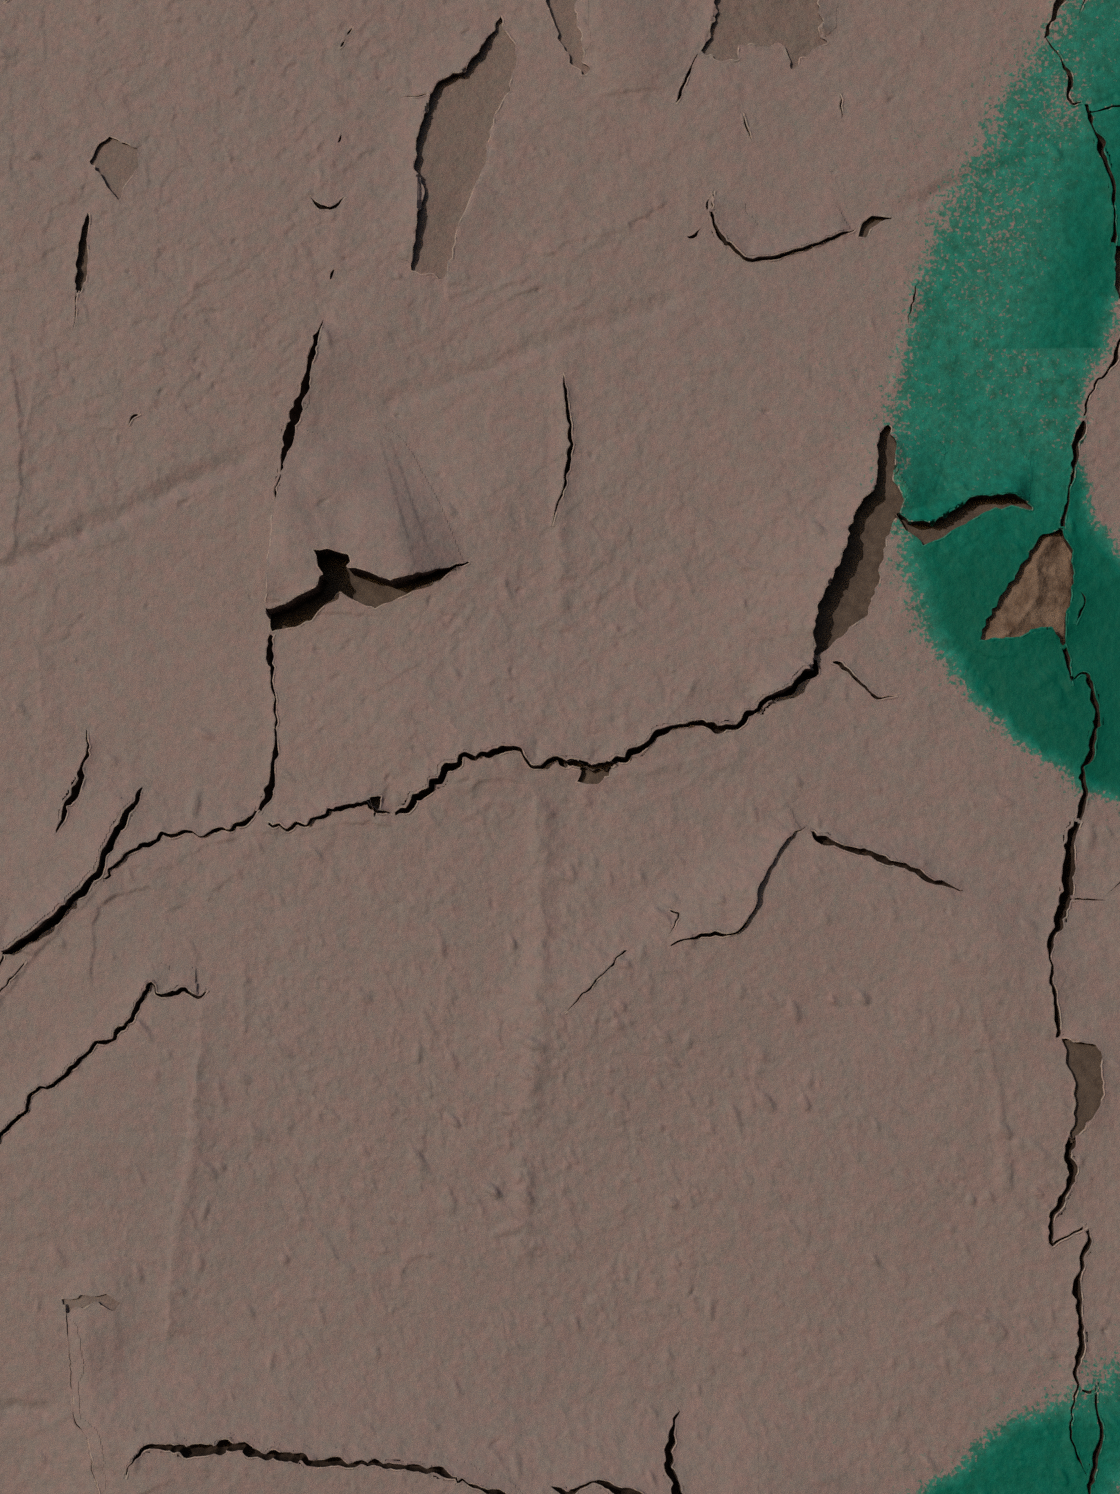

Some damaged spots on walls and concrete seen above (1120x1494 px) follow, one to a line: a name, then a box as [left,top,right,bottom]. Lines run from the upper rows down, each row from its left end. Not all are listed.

peeling [392,13,519,282]
peeling [673,0,838,106]
peeling [856,214,895,240]
peeling [266,424,472,634]
crack [0,318,898,996]
peeling [743,422,1035,698]
spalling [979,528,1076,686]
crack [1058,306,1120,531]
crack [1045,670,1120,1041]
crack [0,962,210,1145]
crack [63,1304,684,1494]
crack [1046,1135,1106,1494]